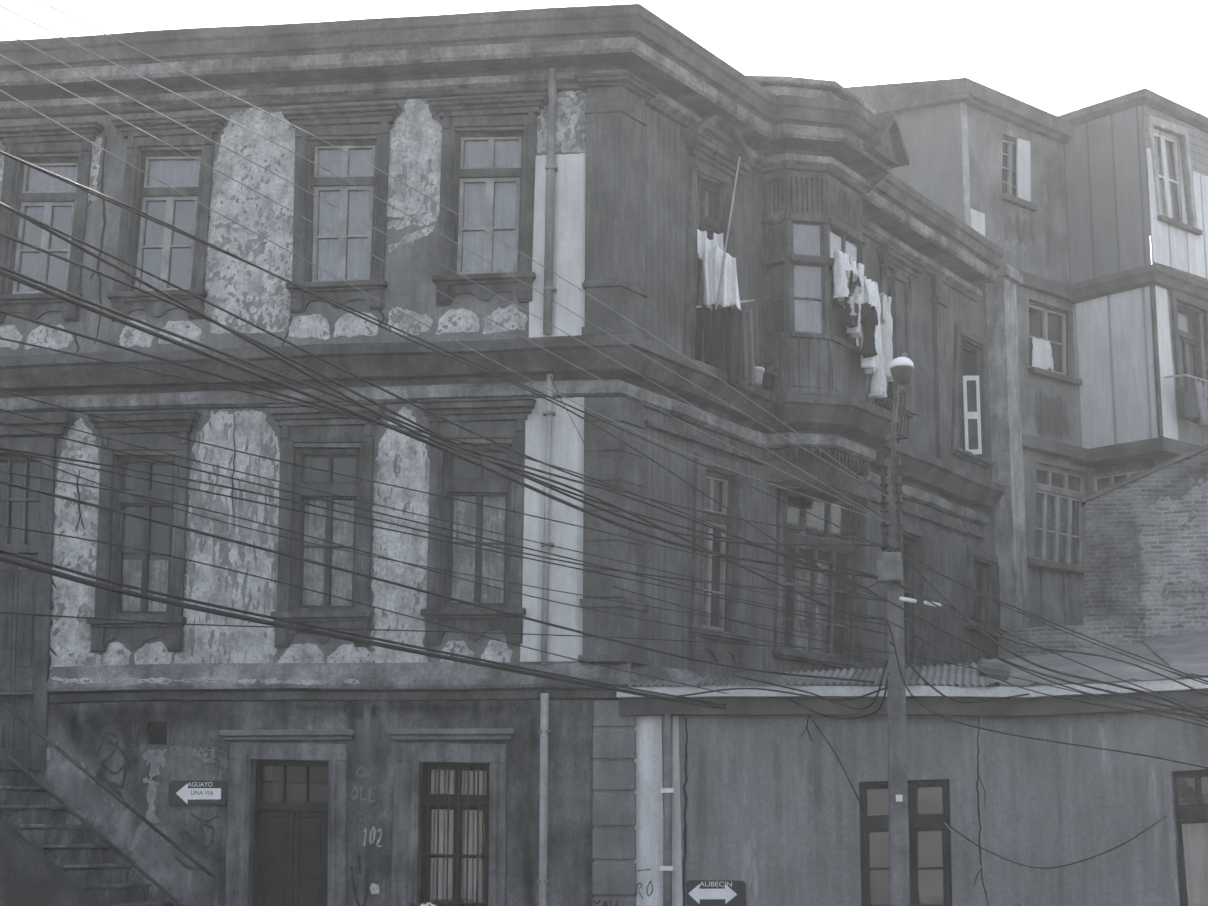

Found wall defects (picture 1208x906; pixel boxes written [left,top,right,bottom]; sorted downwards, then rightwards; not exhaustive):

peeling [537,90,586,153]
crack [74,136,107,353]
peeling [119,98,528,348]
peeling [0,324,73,351]
crack [53,470,85,546]
crack [227,414,236,519]
peeling [50,406,513,685]
peeling [45,741,207,906]